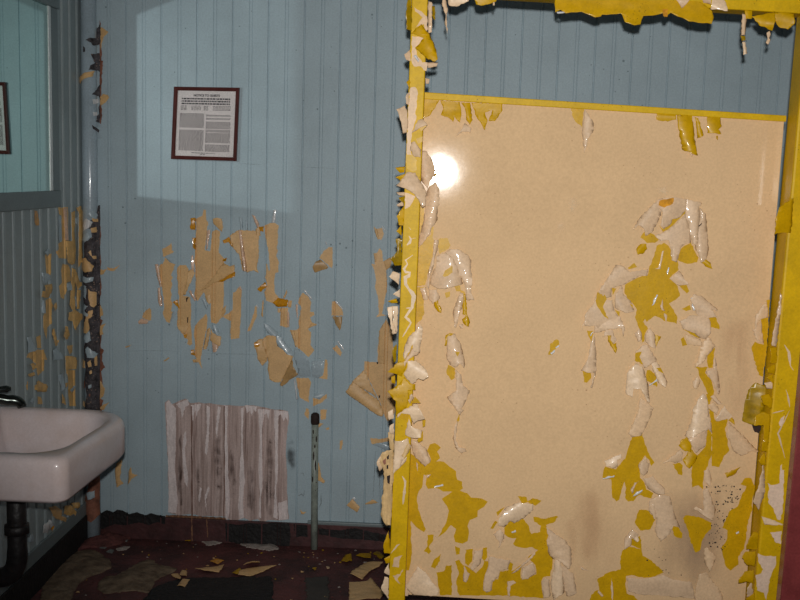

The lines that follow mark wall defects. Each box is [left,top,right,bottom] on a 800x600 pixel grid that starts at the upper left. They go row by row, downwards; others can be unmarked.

peeling [98,23,109,139]
peeling [404,0,496,84]
peeling [555,0,728,25]
peeling [656,114,722,156]
peeling [740,10,795,55]
peeling [26,206,83,406]
peeling [100,254,118,411]
peeling [138,210,329,430]
peeling [313,242,333,273]
peeling [331,301,343,330]
peeling [346,78,588,600]
peeling [581,197,784,600]